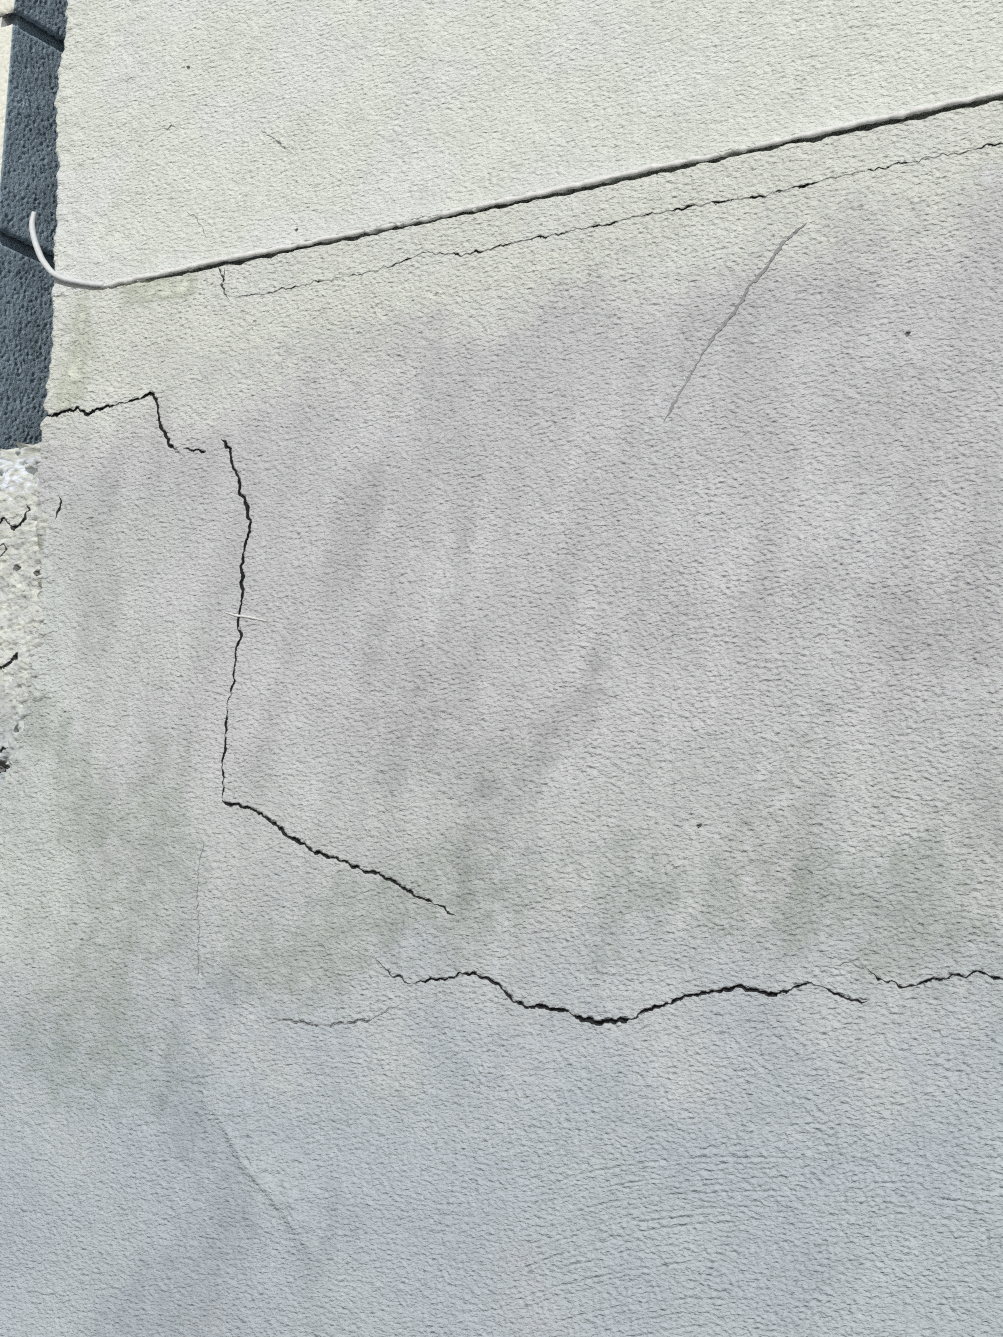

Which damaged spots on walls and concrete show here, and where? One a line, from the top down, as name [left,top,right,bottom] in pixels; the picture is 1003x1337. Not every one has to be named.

crack [43,391,456,916]
crack [195,849,203,970]
crack [276,960,1003,1027]